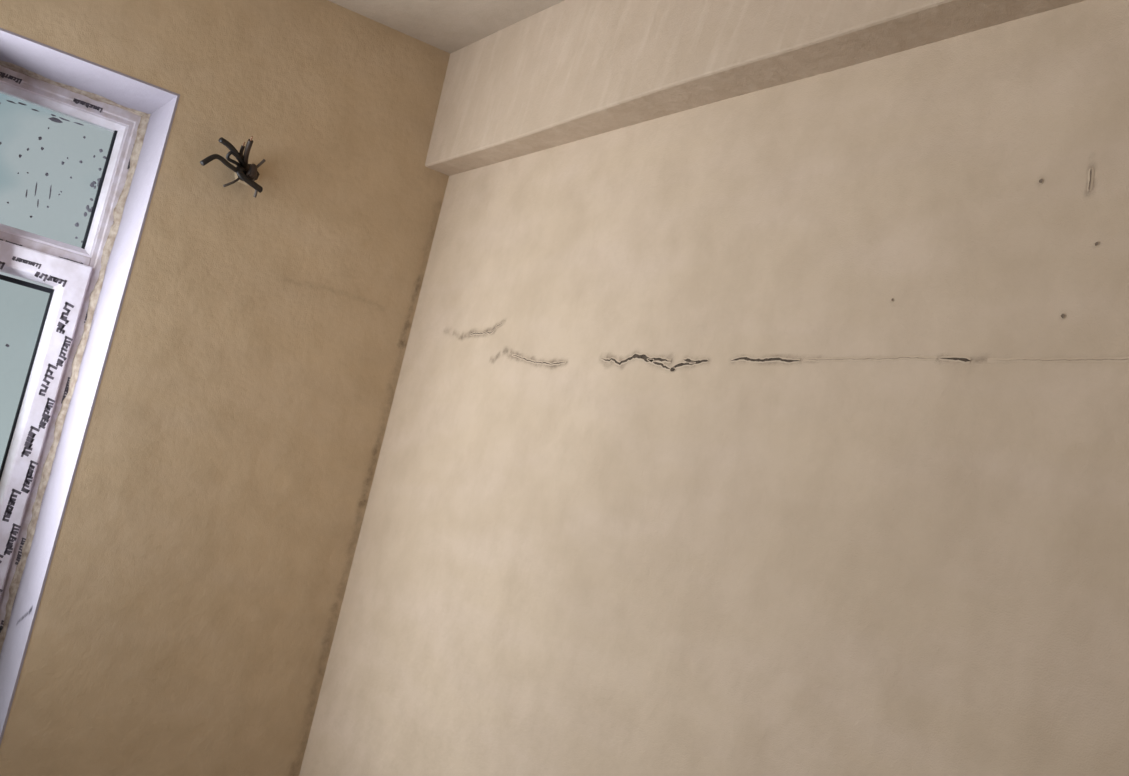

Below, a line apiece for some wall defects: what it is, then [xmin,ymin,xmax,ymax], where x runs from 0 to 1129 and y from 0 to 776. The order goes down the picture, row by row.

crack [461,321,504,338]
crack [512,353,567,366]
crack [601,352,1129,372]